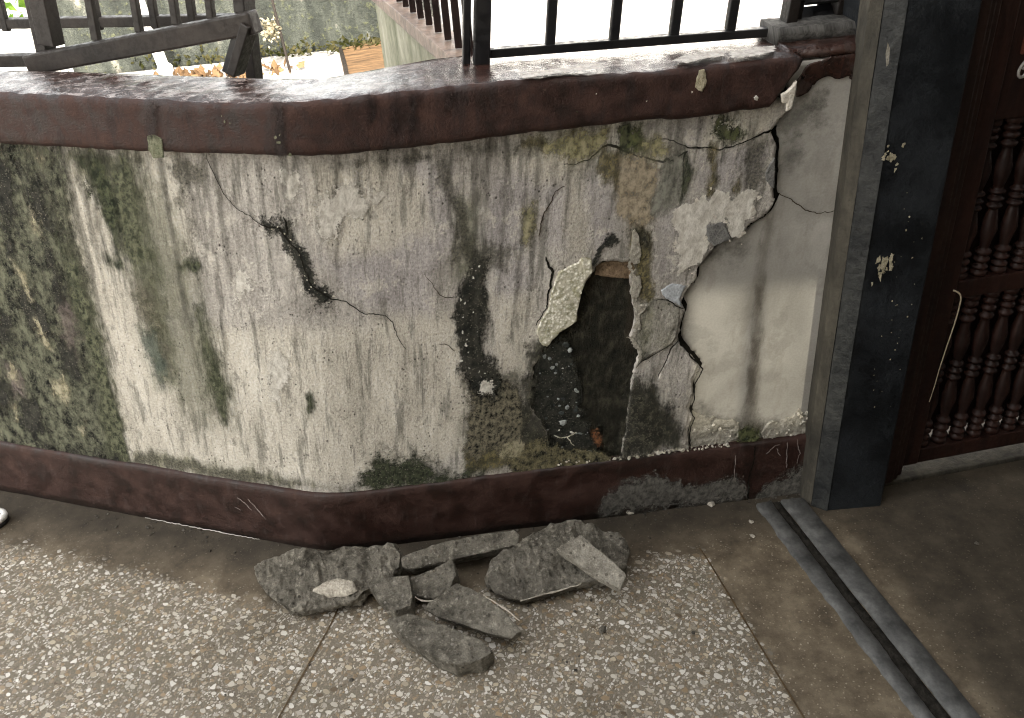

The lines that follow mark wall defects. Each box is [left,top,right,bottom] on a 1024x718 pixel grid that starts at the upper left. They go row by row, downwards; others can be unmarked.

peeling [695,69,707,92]
damp [176,255,201,274]
crack [207,160,406,349]
damp [614,145,685,249]
crack [536,125,833,325]
peeling [670,187,762,276]
peeling [871,253,894,286]
peeling [881,143,906,172]
damp [53,374,69,404]
damp [450,249,535,464]
flaking render [500,229,740,473]
crack [678,246,716,451]